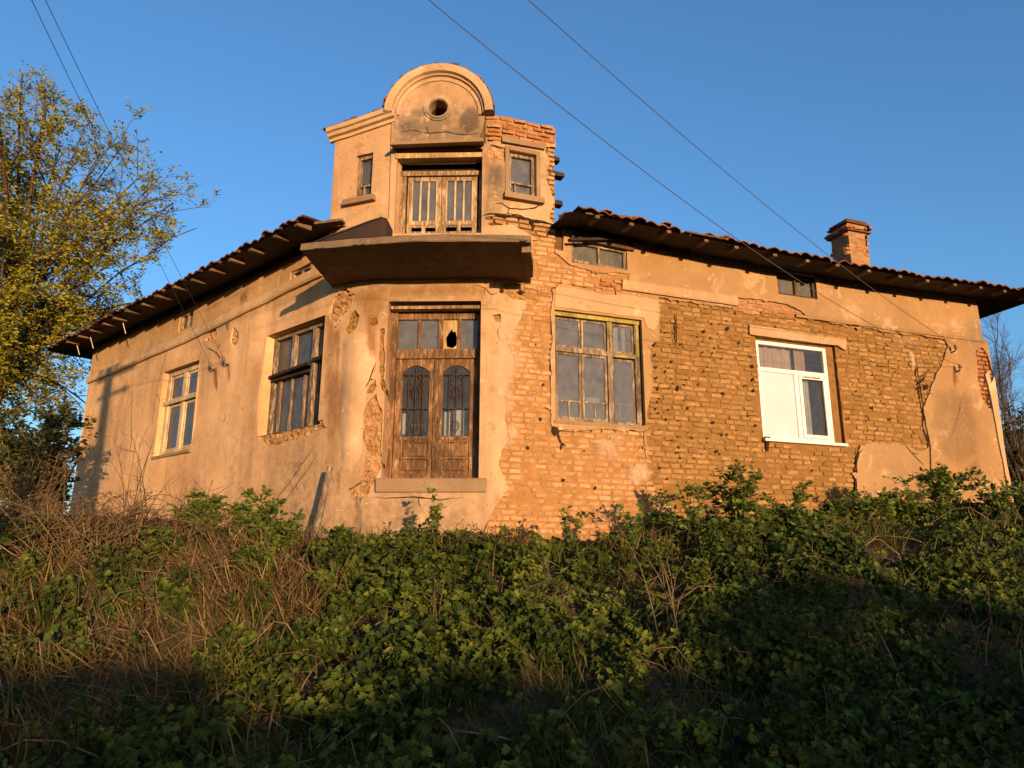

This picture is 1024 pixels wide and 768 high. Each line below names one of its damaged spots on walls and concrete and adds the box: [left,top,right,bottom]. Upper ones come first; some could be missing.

spalling [258,420,326,446]
spalling [326,289,359,333]
spalling [350,318,386,500]
spalling [483,116,947,541]
crack [906,349,963,472]
spalling [976,349,992,412]